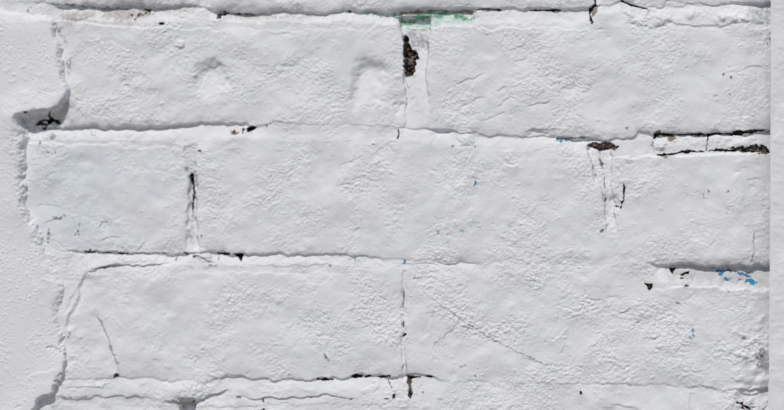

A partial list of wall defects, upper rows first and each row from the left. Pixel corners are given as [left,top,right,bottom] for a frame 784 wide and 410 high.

spalling [403,26,430,77]
spalling [36,113,61,130]
crack [555,134,594,142]
crack [651,130,770,156]
crack [189,173,197,209]
crack [599,159,625,209]
crack [84,249,148,269]
peeling [716,269,757,285]